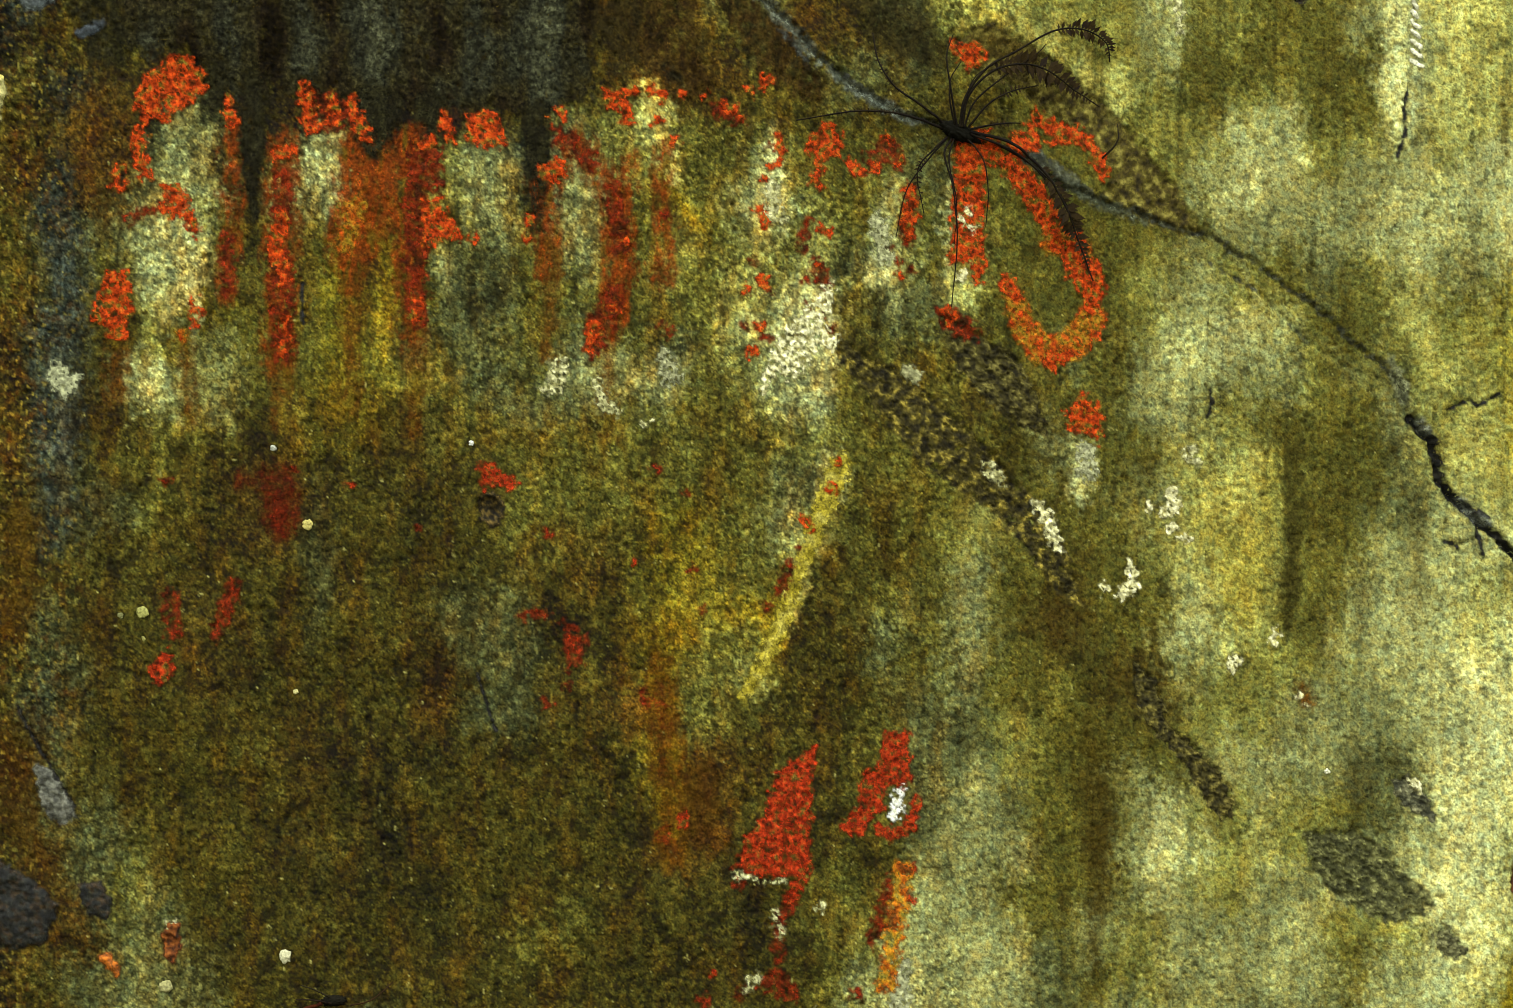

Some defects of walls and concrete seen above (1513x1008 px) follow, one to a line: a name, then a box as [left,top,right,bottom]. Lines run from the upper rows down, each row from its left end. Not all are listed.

leakage [69,0,713,234]
leakage [718,0,821,102]
crack [761,0,936,124]
crack [1396,87,1409,158]
leakage [762,178,790,225]
crack [1021,150,1513,561]